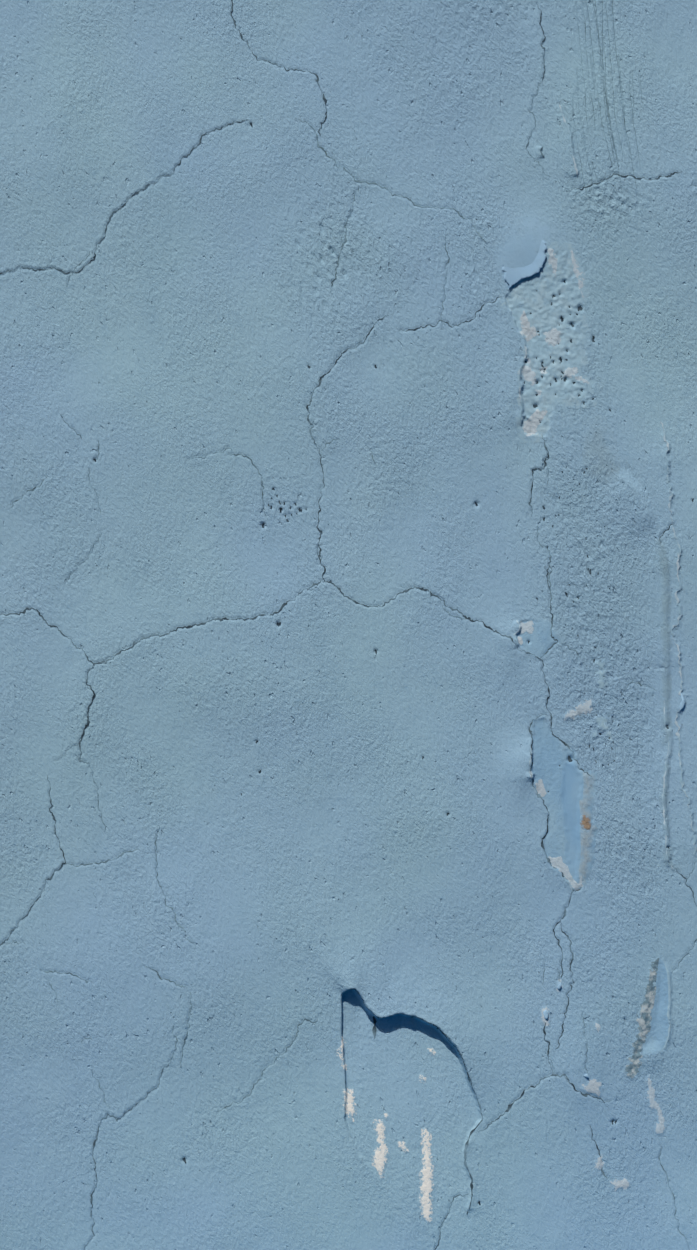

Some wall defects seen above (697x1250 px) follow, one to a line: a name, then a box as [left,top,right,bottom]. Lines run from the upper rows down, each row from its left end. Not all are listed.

crack [526,11,682,190]
spalling [493,217,611,443]
crack [0,0,612,1132]
peeling [528,697,615,895]
crack [84,966,192,1250]
spalling [624,955,674,1137]
crack [658,1151,690,1249]